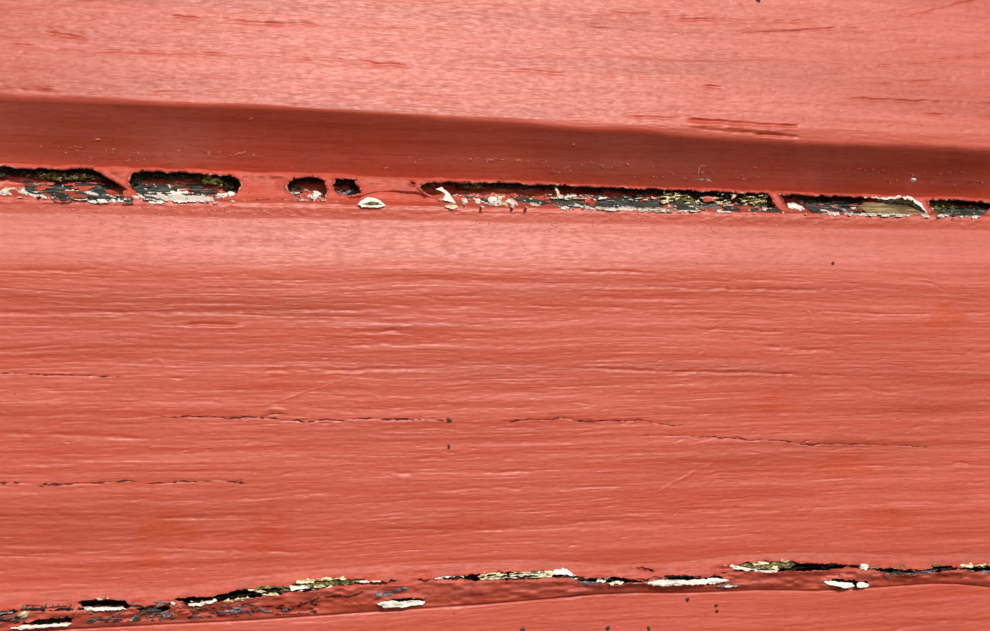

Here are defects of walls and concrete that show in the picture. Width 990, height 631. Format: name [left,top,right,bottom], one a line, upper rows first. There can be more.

peeling [0,166,245,204]
peeling [287,177,326,201]
peeling [335,179,385,208]
peeling [420,182,990,219]
crack [3,370,119,378]
crack [158,413,444,423]
crack [501,417,926,447]
crack [0,479,245,487]
peeling [174,602,317,619]